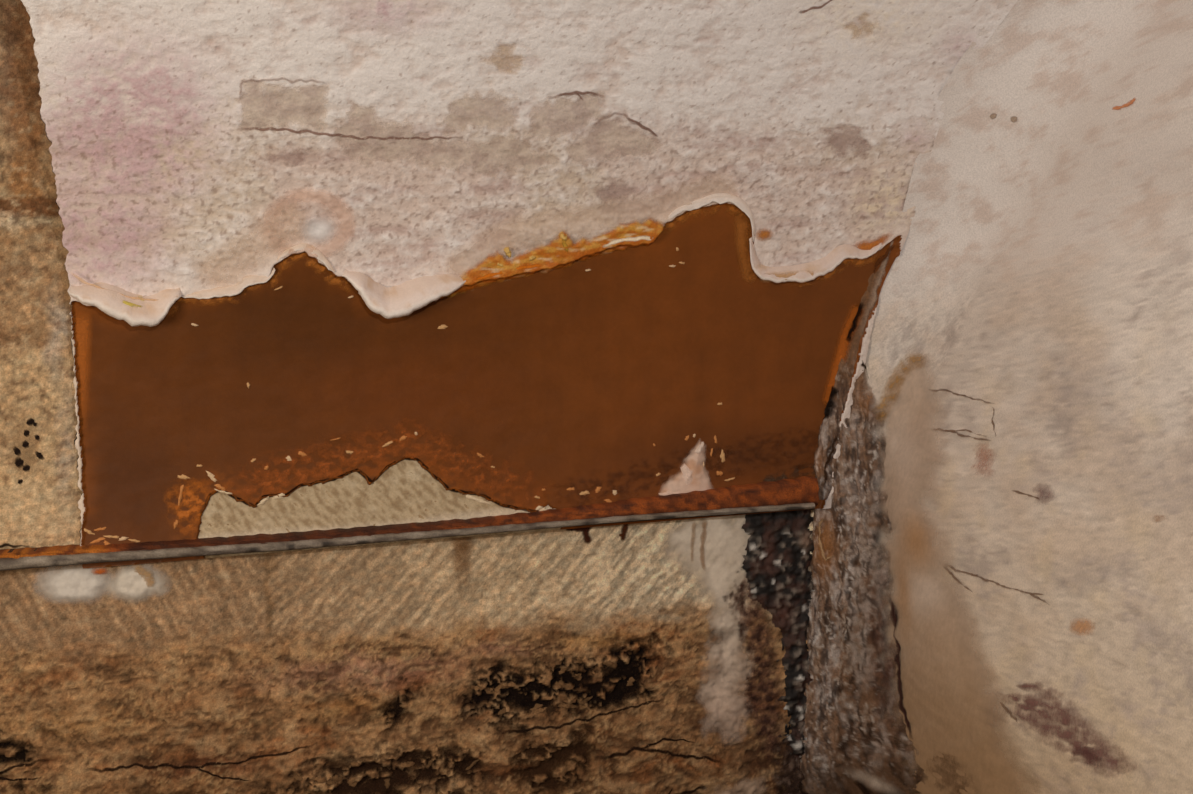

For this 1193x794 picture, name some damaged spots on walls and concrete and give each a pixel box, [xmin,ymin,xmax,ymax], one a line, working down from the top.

flaking render [664,193,883,283]
flaking render [68,243,466,327]
corrosion [0,203,902,569]
spalling [198,458,552,538]
spalling [205,527,561,558]
water stain [670,241,1119,794]
crack [508,701,658,733]
crack [0,761,38,781]
crack [98,747,304,781]
crack [605,738,716,794]